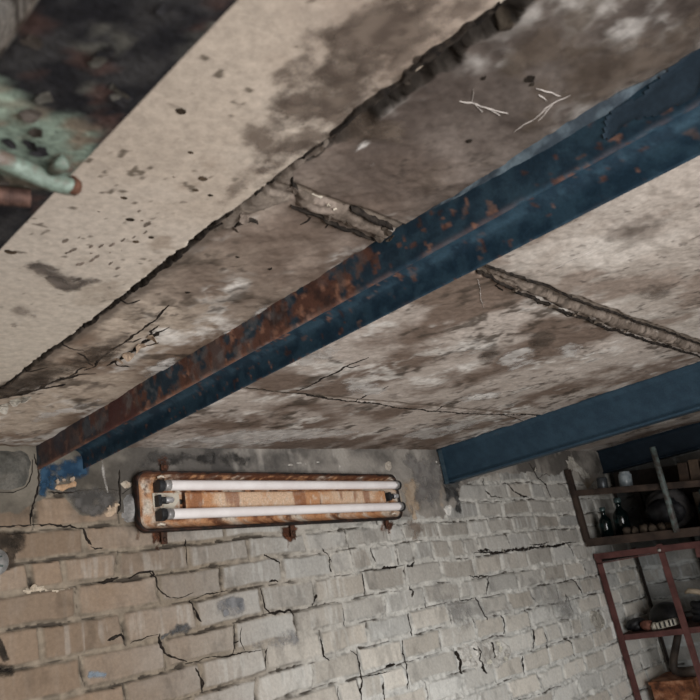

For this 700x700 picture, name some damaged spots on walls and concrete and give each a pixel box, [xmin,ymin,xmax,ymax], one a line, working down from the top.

damp [246,0,481,174]
crack [291,205,393,242]
damp [46,267,100,291]
crack [0,141,324,399]
crack [476,264,700,358]
damp [147,358,174,375]
damp [481,331,555,370]
damp [185,430,353,443]
flaking render [51,476,81,494]
corrosion [282,526,297,542]
crack [130,626,267,693]
crack [350,587,426,700]